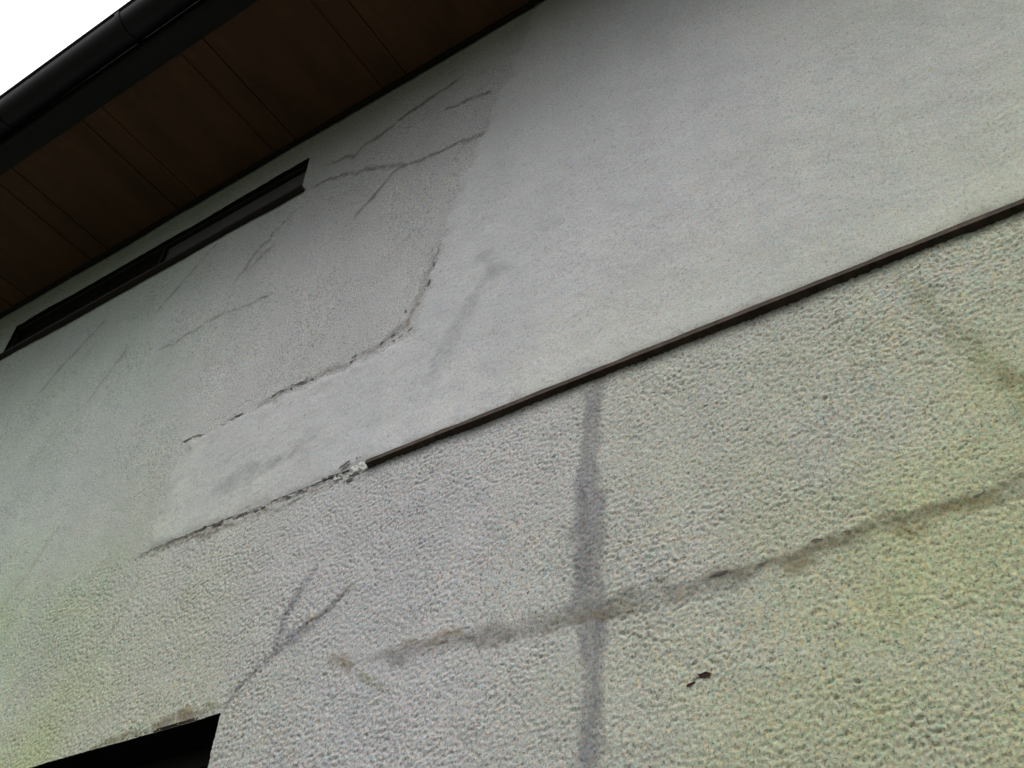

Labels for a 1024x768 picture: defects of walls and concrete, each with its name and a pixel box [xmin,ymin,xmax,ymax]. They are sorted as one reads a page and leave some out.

crack [308,81,490,219]
crack [271,310,413,398]
crack [140,473,341,555]
damp [551,389,635,659]
damp [694,519,892,580]
crack [224,596,341,707]